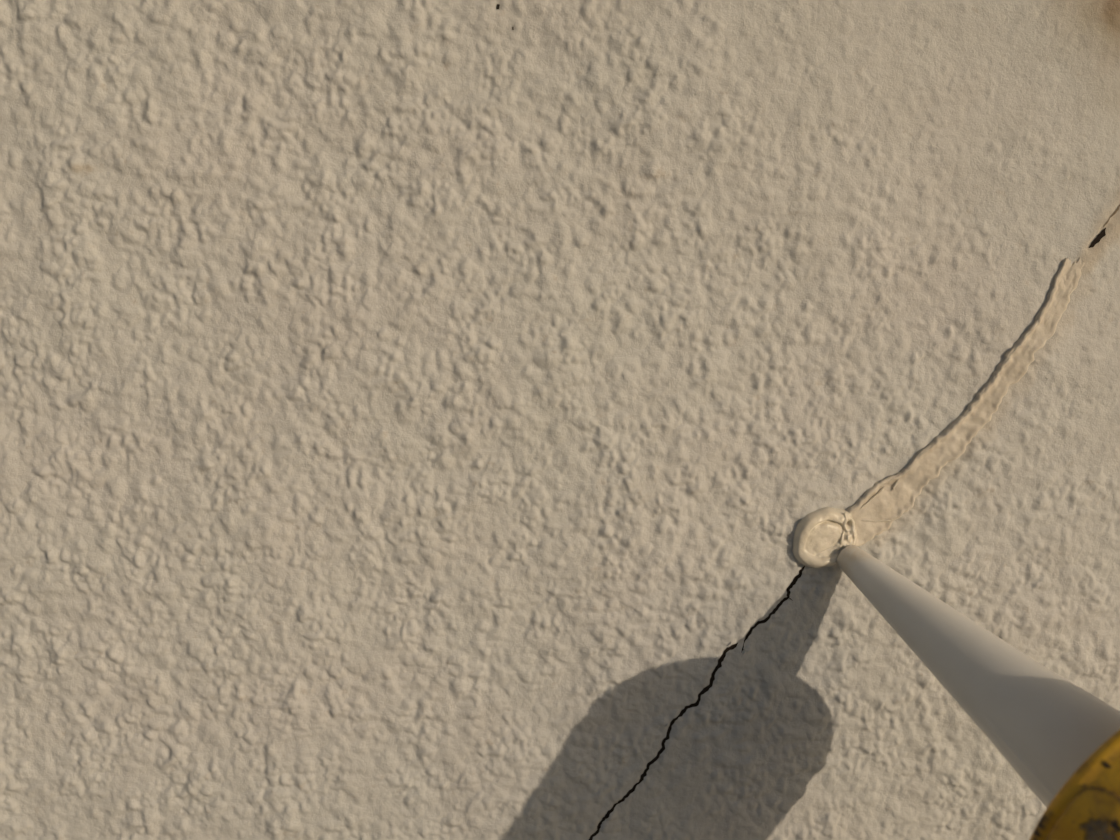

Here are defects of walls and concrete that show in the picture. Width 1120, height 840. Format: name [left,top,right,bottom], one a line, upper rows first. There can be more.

crack [1089,205,1120,248]
crack [589,566,805,840]